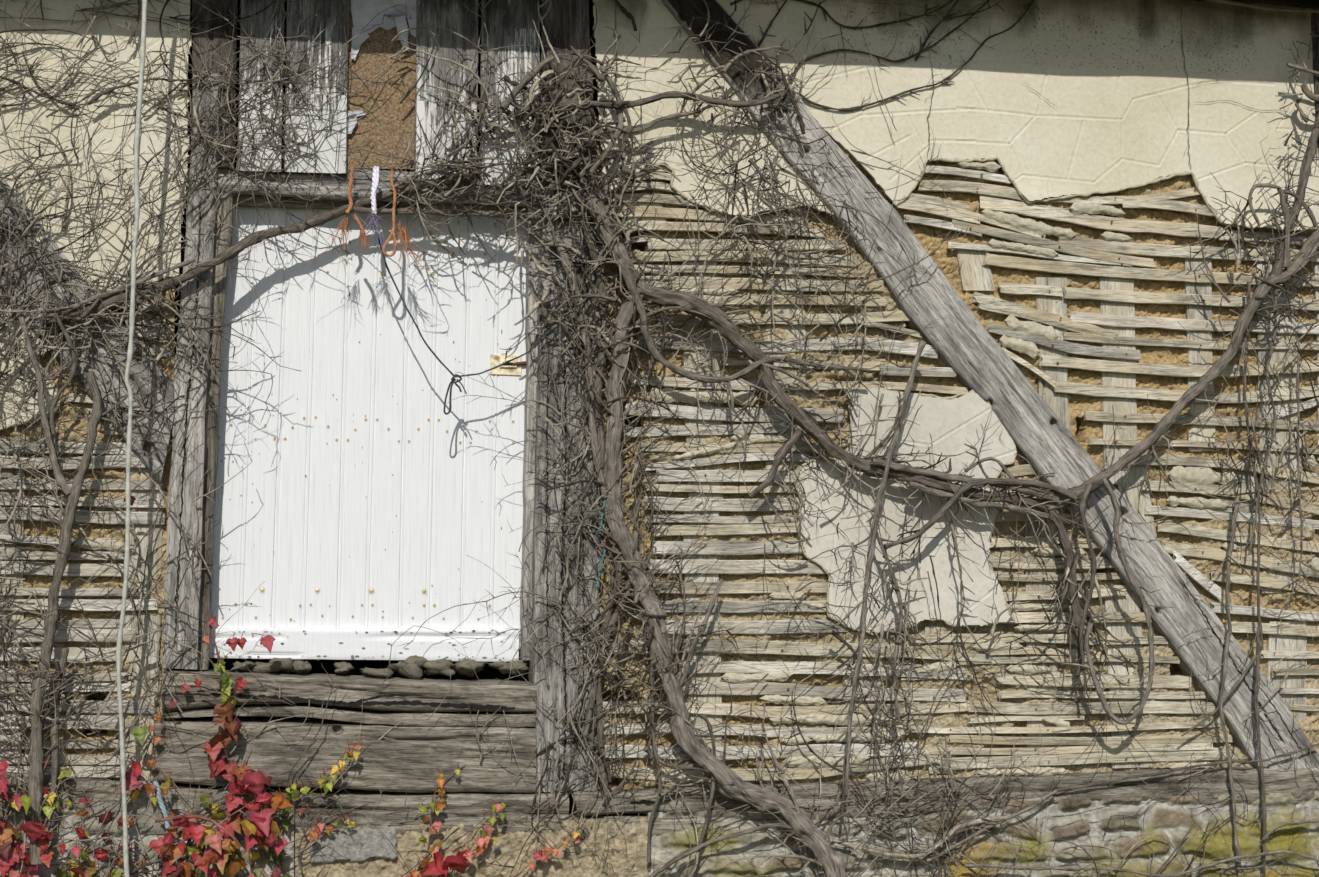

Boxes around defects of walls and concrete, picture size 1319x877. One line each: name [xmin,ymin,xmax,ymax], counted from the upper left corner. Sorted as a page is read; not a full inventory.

flaking render [607,162,835,218]
flaking render [895,157,1315,259]
flaking render [999,315,1059,359]
flaking render [648,388,759,406]
flaking render [675,434,788,461]
flaking render [1166,466,1238,511]
flaking render [769,387,1087,675]
flaking render [1309,557,1319,575]
flaking render [721,669,911,782]
flaking render [1042,717,1071,734]
flaking render [978,767,1070,777]
flaking render [1169,762,1213,770]